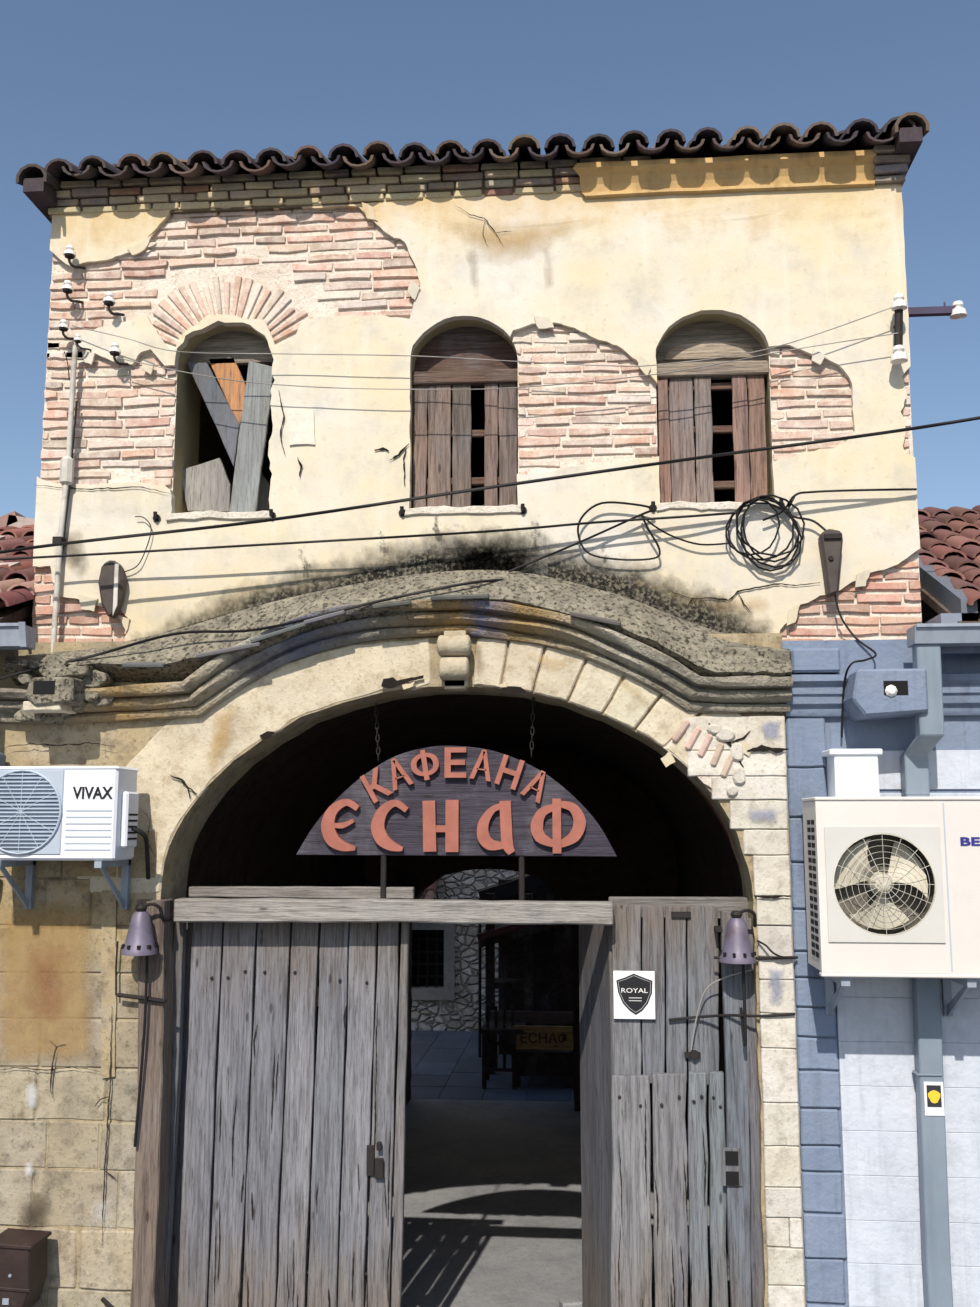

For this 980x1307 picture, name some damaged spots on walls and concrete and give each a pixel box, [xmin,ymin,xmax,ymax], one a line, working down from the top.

crack [456,206,508,246]
flaking render [40,202,420,491]
flaking render [504,316,658,475]
flaking render [768,348,853,462]
flaking render [32,567,131,642]
damp [164,517,765,634]
flaking render [780,550,922,641]
flaking render [661,720,752,797]